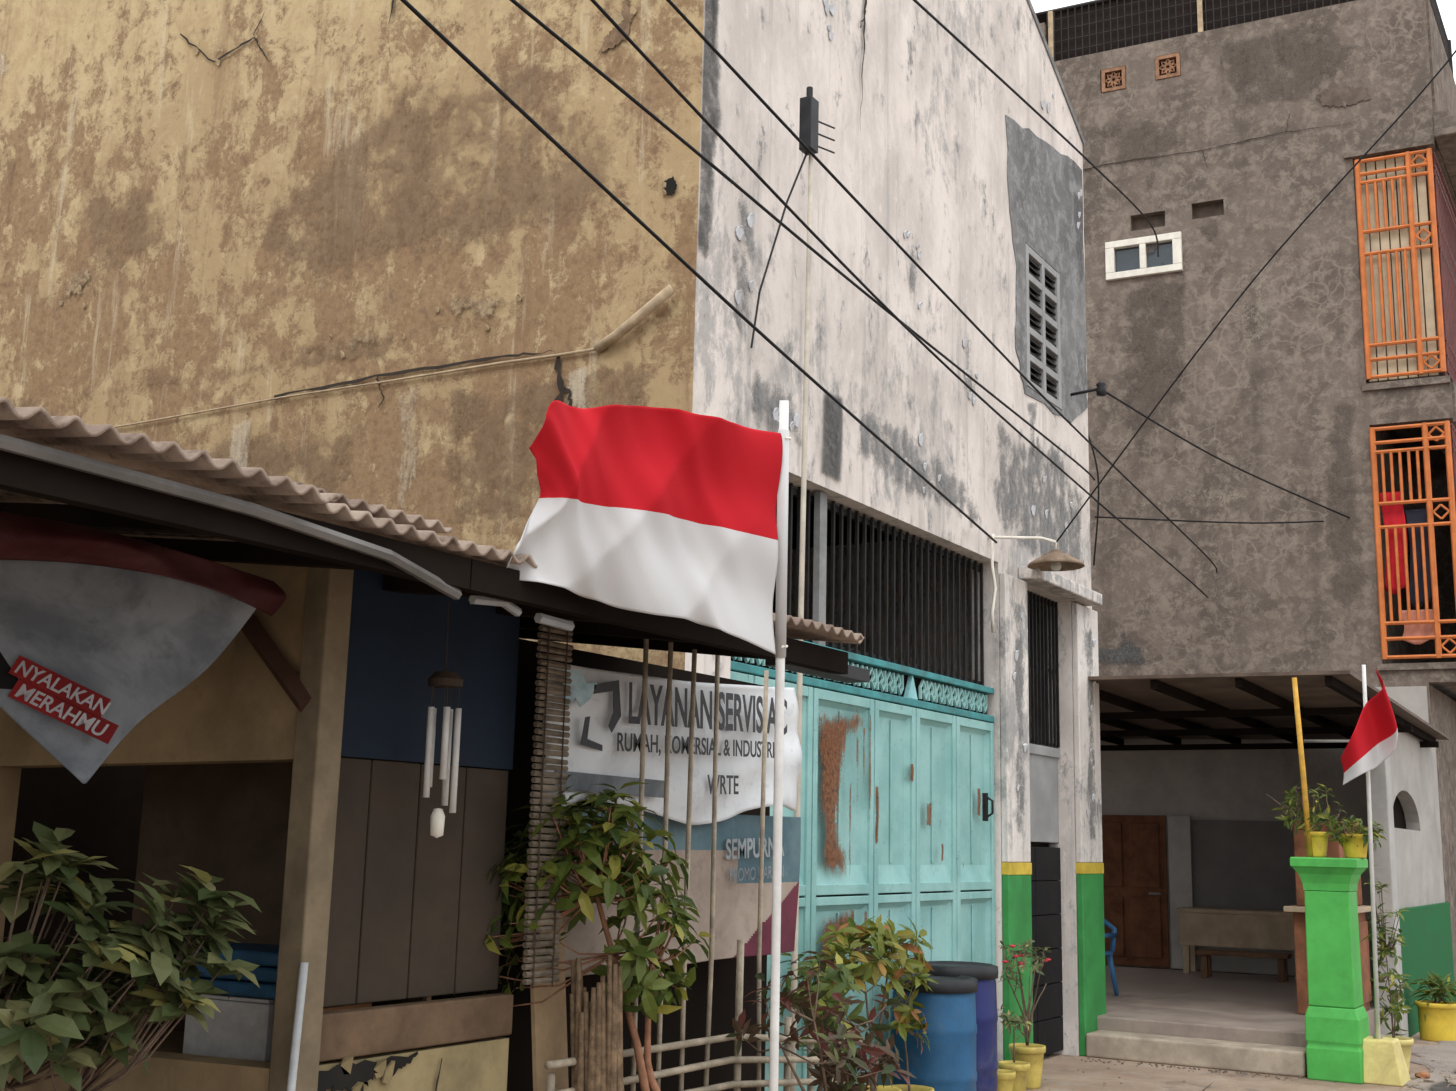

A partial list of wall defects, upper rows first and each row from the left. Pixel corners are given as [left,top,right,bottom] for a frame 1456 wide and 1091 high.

crack [180,13,269,62]
flaking render [599,0,637,53]
leakage [699,0,721,256]
crack [859,0,867,131]
corrosion [819,713,879,873]
spalling [317,1051,418,1091]